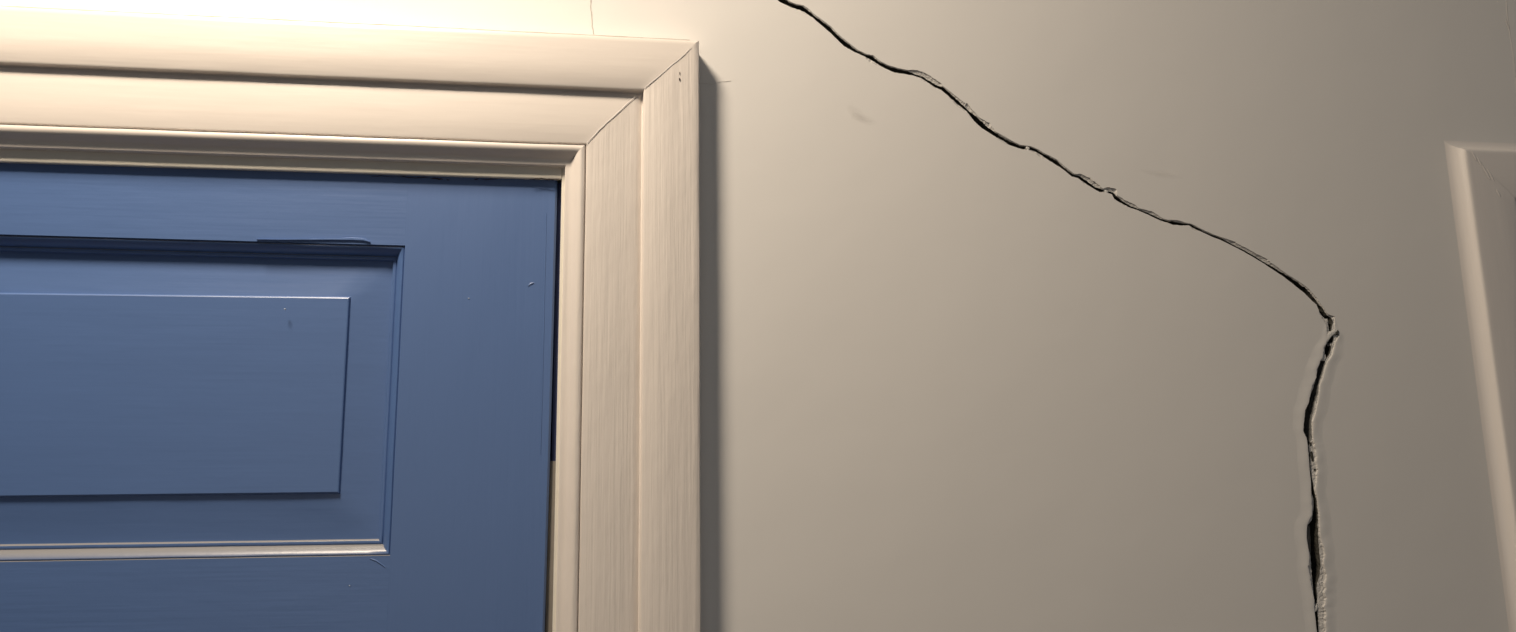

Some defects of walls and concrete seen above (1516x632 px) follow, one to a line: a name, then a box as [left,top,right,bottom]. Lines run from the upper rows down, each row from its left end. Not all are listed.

crack [777,0,1345,632]